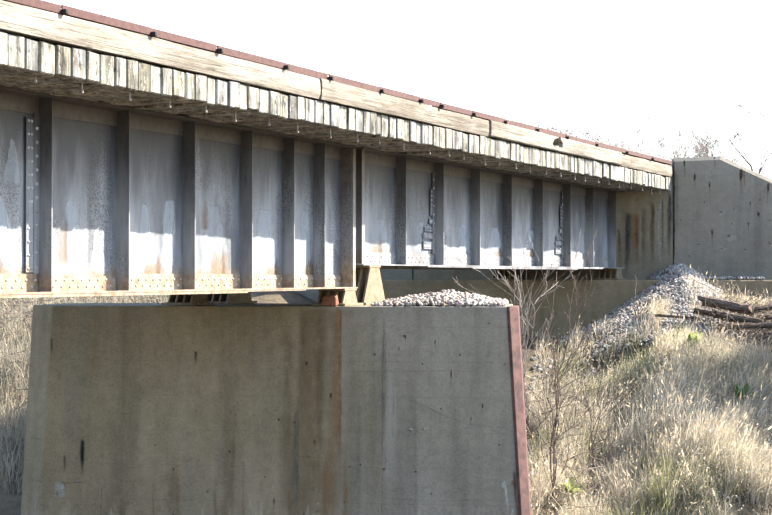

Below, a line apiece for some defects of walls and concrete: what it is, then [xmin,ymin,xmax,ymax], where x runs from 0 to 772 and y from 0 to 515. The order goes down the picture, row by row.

peeling [0,196,21,261]
peeling [60,202,106,268]
peeling [138,201,174,264]
peeling [255,210,276,264]